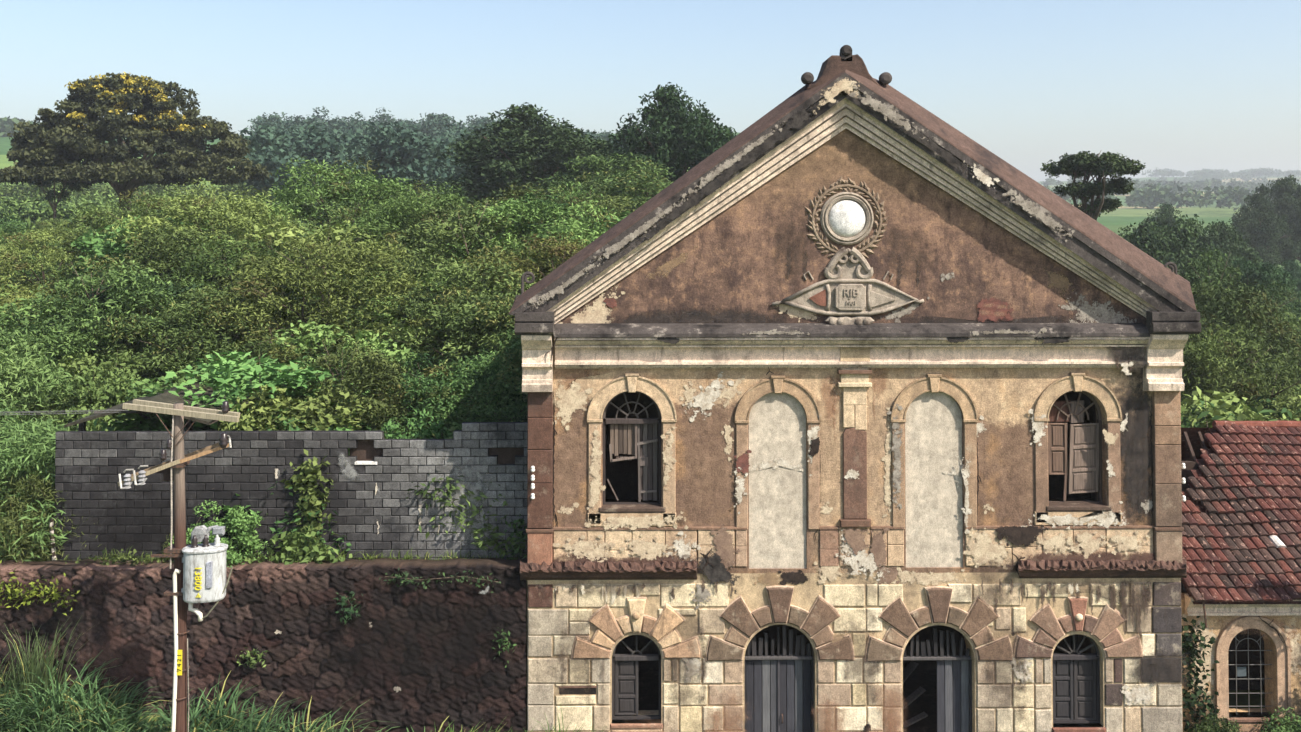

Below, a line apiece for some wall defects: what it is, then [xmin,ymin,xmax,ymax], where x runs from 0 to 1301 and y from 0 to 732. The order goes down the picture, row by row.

peeling [813,77,928,141]
peeling [963,161,1075,242]
peeling [553,377,593,431]
peeling [661,372,821,514]
peeling [553,422,740,569]
peeling [754,404,1150,586]
water stain [689,545,744,596]
water stain [979,579,1152,640]
water stain [1133,652,1186,683]